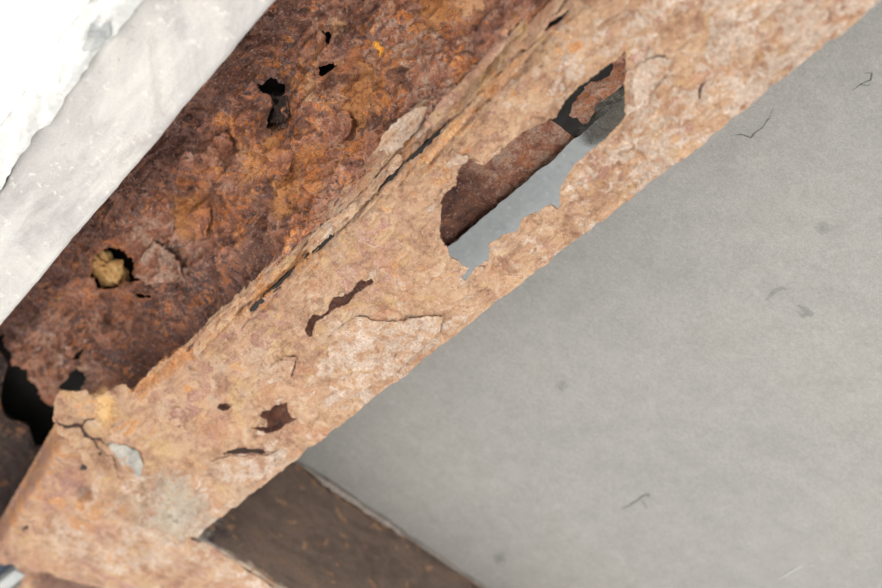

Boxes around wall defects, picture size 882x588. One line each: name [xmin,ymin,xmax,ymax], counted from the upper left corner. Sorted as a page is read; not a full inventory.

corrosion [331,17,345,35]
corrosion [421,0,485,32]
corrosion [262,92,291,155]
corrosion [342,62,382,130]
peeling [186,202,212,245]
corrosion [272,144,325,221]
peeling [193,34,549,358]
corrosion [128,345,203,399]
corrosion [96,394,116,427]
crack [54,417,121,472]